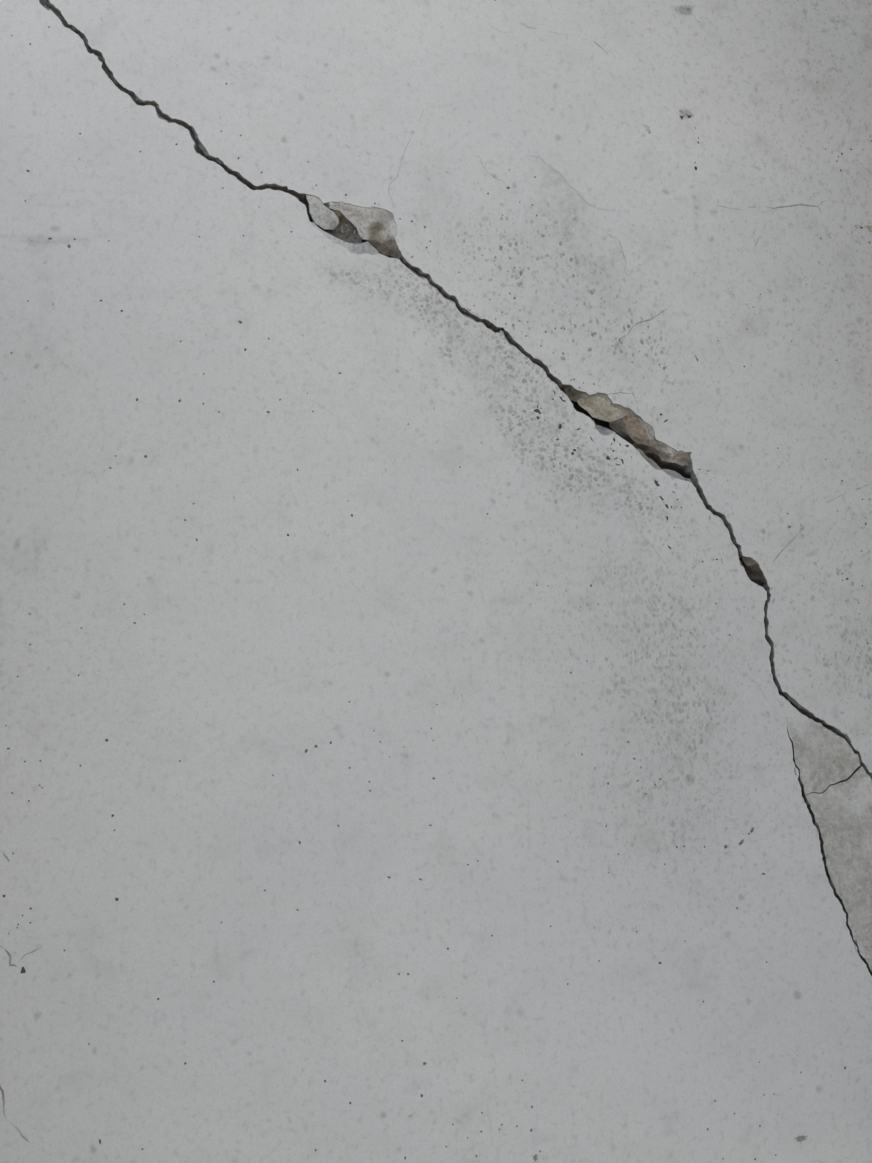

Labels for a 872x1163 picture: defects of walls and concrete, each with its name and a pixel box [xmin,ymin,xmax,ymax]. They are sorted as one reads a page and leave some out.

crack [39,0,342,231]
spalling [306,195,403,259]
spalling [524,385,711,537]
crack [341,201,872,976]
spalling [739,555,768,590]